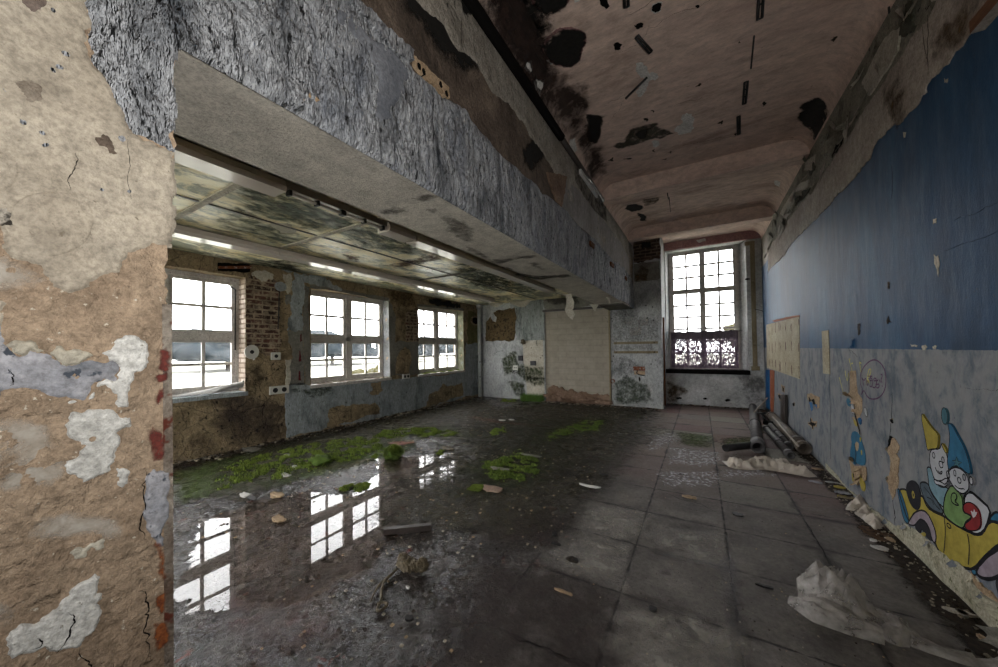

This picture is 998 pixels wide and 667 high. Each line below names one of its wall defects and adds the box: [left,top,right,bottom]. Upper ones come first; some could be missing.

peeling [0,301,149,488]
damp [218,188,414,254]
peeling [0,0,661,308]
peeling [217,263,613,438]
damp [454,256,570,292]
damp [502,351,545,397]
damp [480,0,605,179]
damp [615,312,657,404]
damp [797,98,827,140]
peeling [764,0,987,271]
peeling [6,574,102,659]
flaking render [825,463,998,648]